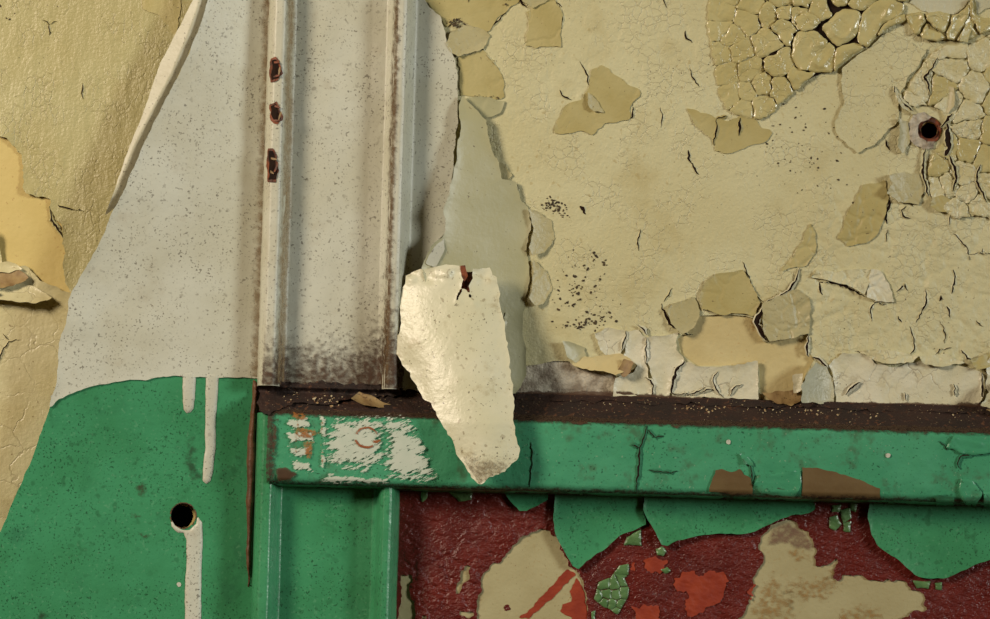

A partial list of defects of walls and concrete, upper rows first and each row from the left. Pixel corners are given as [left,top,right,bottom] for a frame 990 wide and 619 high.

crack [893,57,938,111]
crack [884,113,987,242]
peeling [396,0,990,502]
peeling [0,0,283,619]
crack [743,216,990,397]
crack [0,334,19,362]
peeling [351,392,391,408]
crack [632,426,677,492]
crack [748,465,756,485]
crack [940,441,984,468]
peeling [456,454,990,619]
peeling [398,575,427,619]